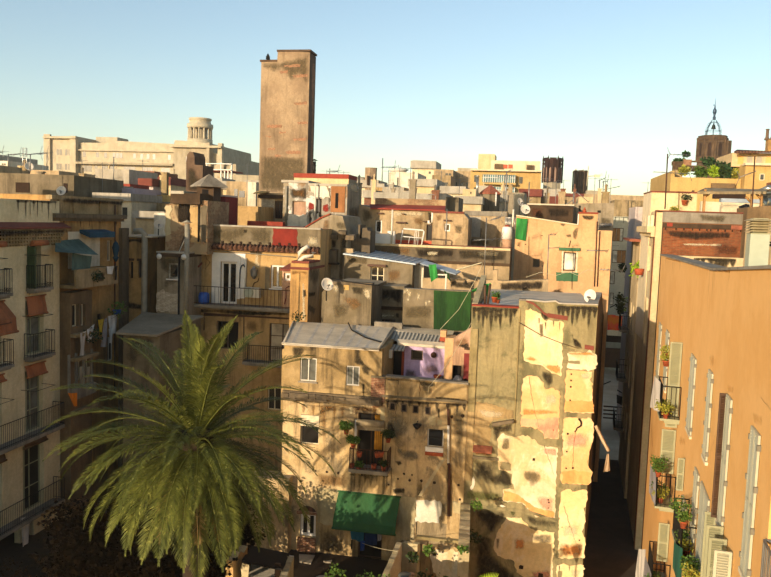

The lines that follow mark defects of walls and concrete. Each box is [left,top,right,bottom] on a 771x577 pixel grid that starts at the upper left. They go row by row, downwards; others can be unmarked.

damp [17,200,56,219]
damp [472,307,517,326]
peeling [473,308,598,577]